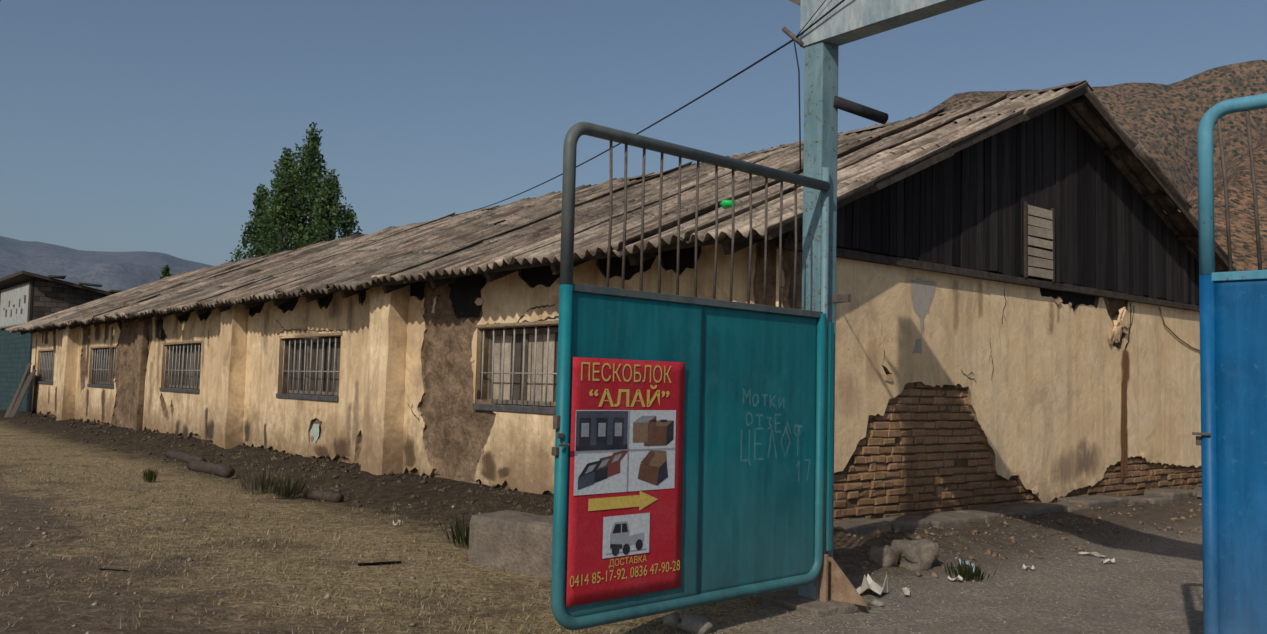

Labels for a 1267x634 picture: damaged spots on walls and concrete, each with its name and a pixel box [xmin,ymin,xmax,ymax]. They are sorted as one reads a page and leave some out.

spalling [249,298,298,317]
spalling [316,294,333,309]
spalling [518,265,560,288]
peeling [912,279,935,353]
peeling [1040,288,1129,349]
flaking render [80,303,212,427]
flaking render [410,273,496,484]
peeling [308,418,322,444]
flaking render [834,351,1202,521]